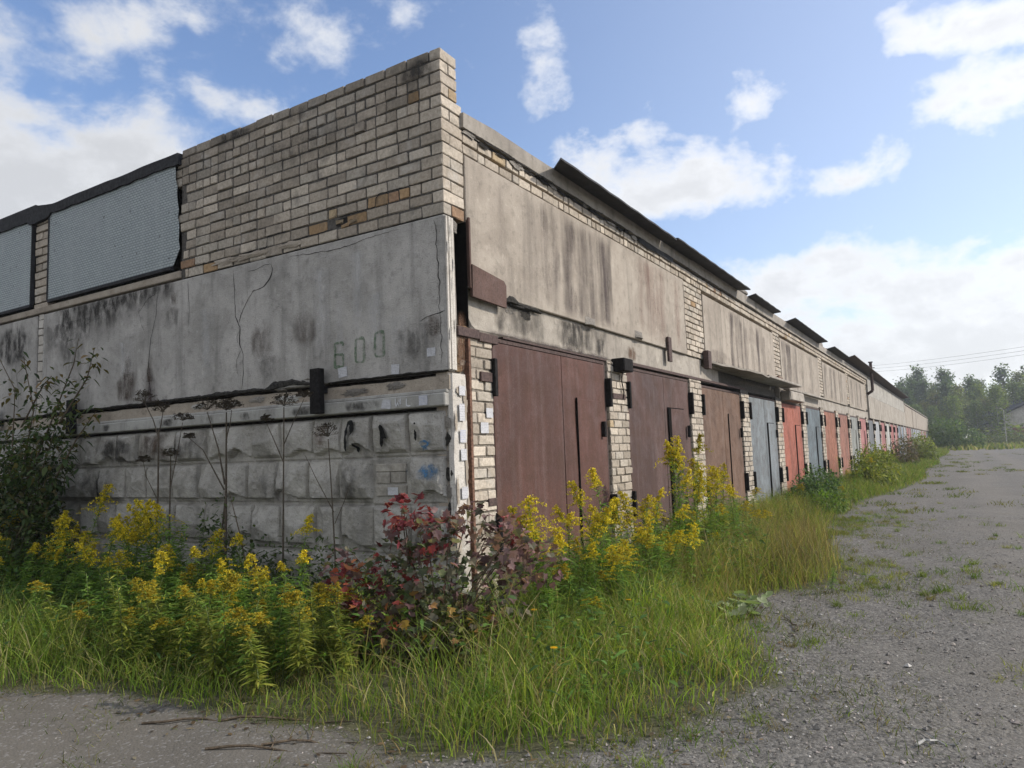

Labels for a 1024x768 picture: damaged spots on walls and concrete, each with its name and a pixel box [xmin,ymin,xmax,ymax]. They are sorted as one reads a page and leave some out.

leakage [0,330,26,363]
leakage [62,284,175,330]
crack [233,230,393,384]
crack [421,222,445,361]
leakage [493,310,607,359]
leakage [566,229,609,319]